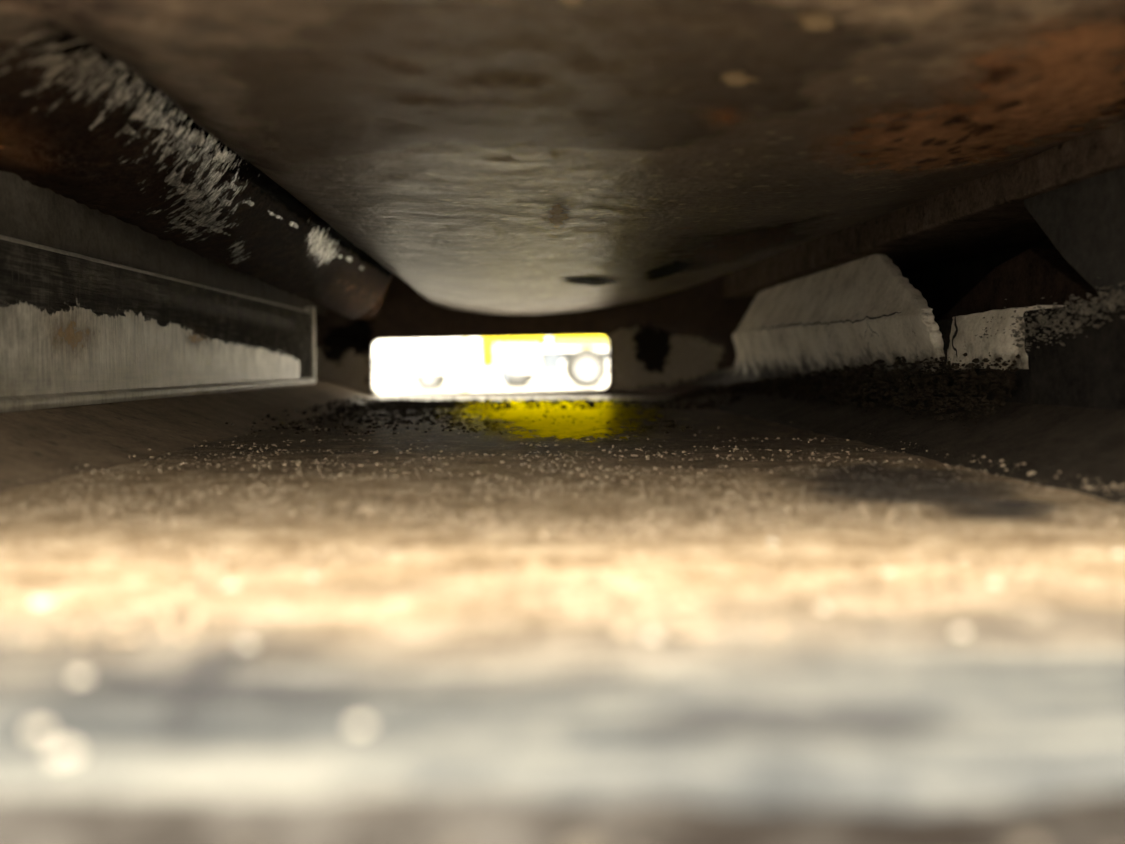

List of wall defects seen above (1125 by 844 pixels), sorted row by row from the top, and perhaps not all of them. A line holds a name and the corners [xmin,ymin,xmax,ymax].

peeling [0,295,301,396]
leakage [609,323,724,390]